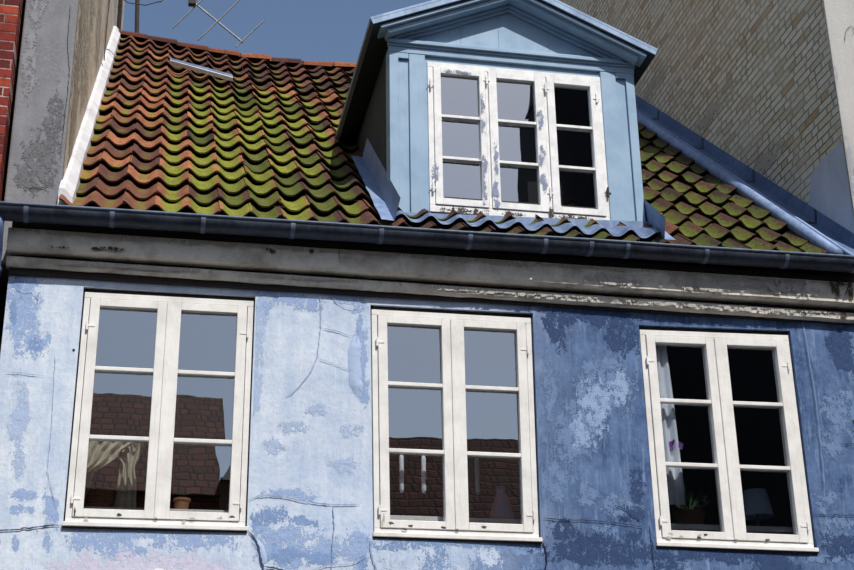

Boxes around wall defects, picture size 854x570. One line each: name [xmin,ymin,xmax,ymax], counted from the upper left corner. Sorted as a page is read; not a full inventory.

damp [843,127,854,193]
damp [12,228,854,301]
crack [281,293,360,398]
damp [528,306,642,373]
damp [823,311,854,379]
crack [0,369,59,531]
peeling [539,348,650,539]
flaking render [30,505,506,570]
crack [249,495,377,570]
damp [357,517,854,570]